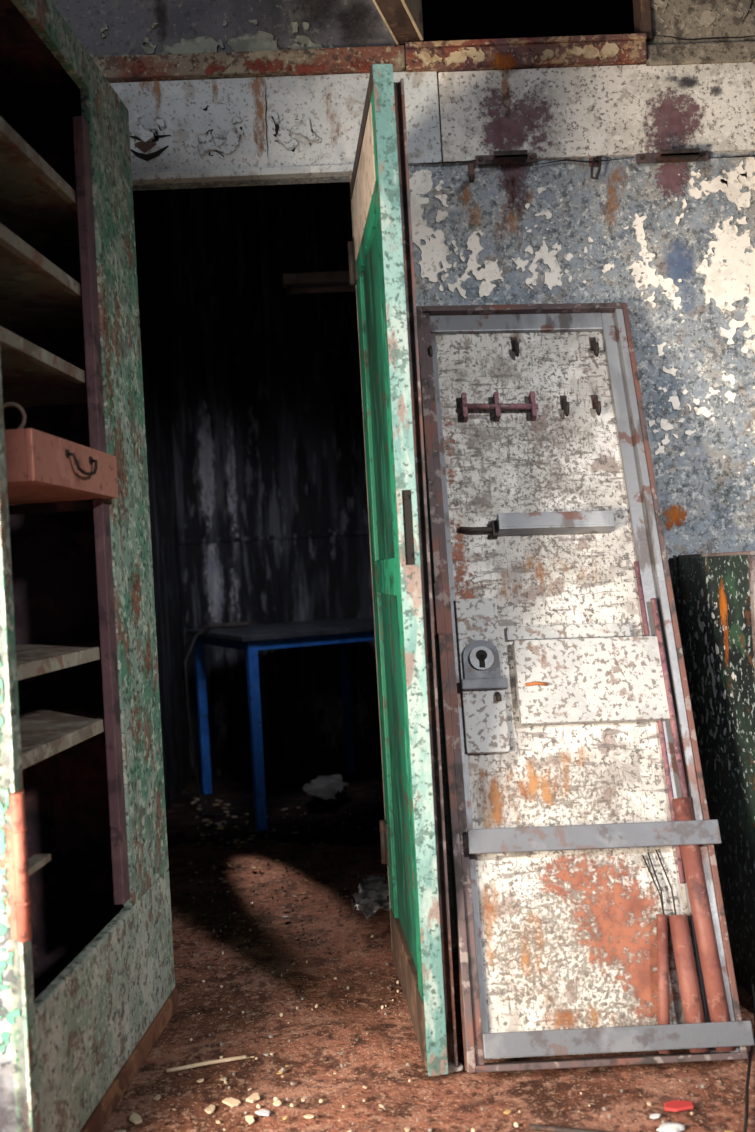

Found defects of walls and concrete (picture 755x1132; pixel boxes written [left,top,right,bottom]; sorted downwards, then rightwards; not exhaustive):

corrosion [243,58,326,153]
corrosion [479,52,554,232]
corrosion [639,88,706,200]
peeling [409,169,684,323]
peeling [649,157,755,455]
corrosion [663,505,686,530]